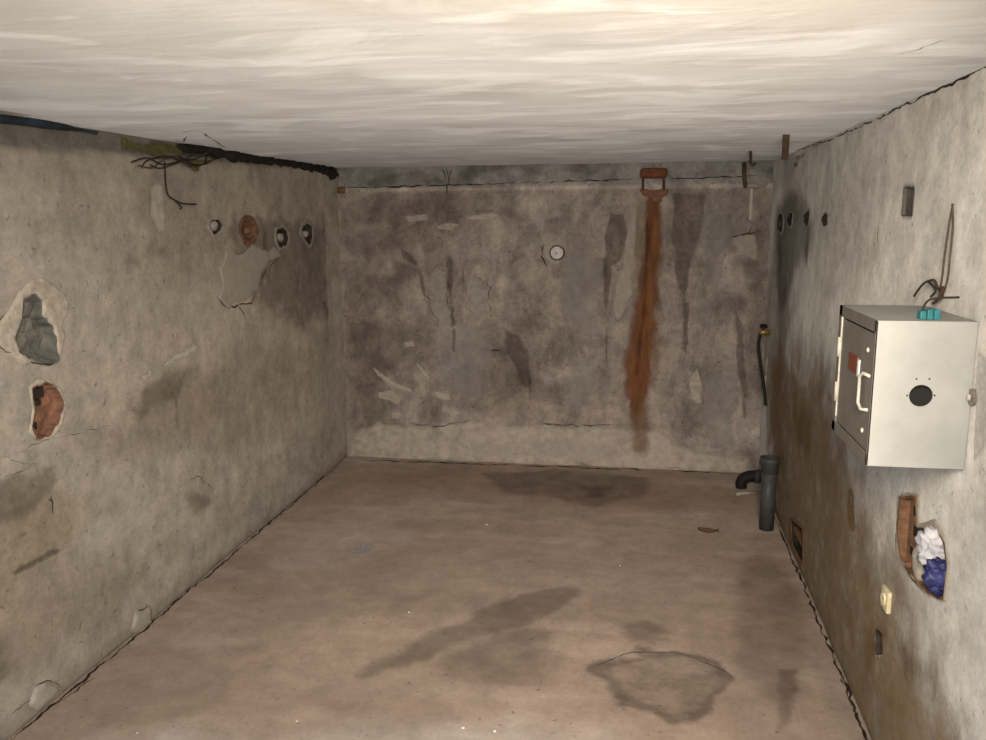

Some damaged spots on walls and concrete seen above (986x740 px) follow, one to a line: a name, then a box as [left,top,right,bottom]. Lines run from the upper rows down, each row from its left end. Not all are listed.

spalling [0,279,69,366]
peeling [219,215,314,323]
corrosion [625,197,660,420]
spalling [29,379,66,440]
leakage [768,356,951,740]
spalling [895,492,950,602]